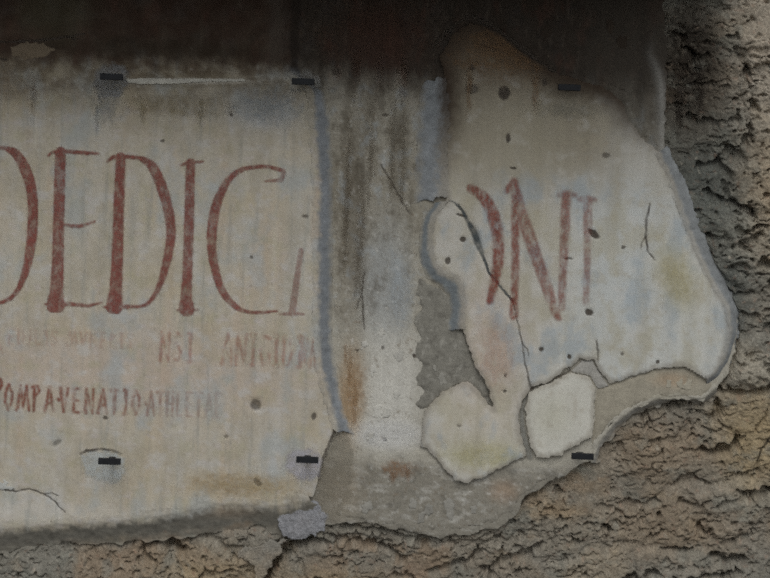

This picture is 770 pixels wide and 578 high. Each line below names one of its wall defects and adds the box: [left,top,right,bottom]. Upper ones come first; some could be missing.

crack [455,203,512,300]
spalling [303,75,547,533]
crack [5,488,65,512]